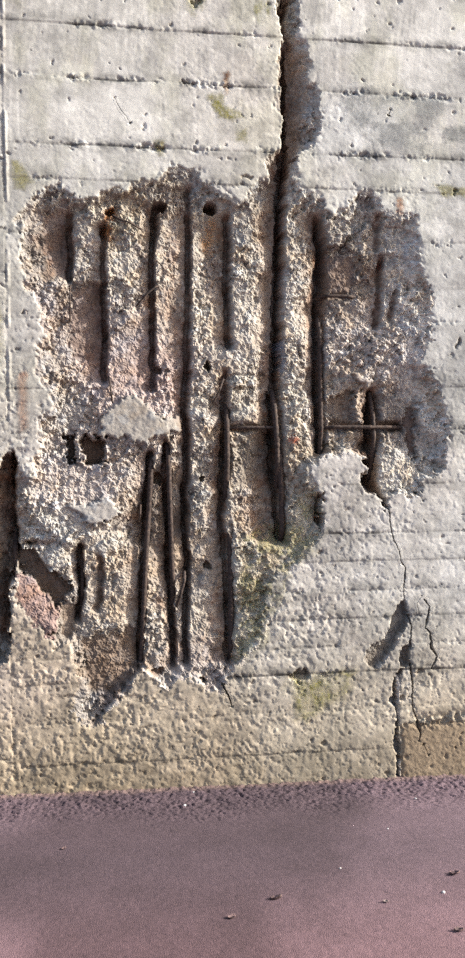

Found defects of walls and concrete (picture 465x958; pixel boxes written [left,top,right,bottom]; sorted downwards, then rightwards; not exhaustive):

spalling [0,0,453,729]
crack [266,0,290,400]
spalling [364,601,412,776]
crack [385,508,440,756]